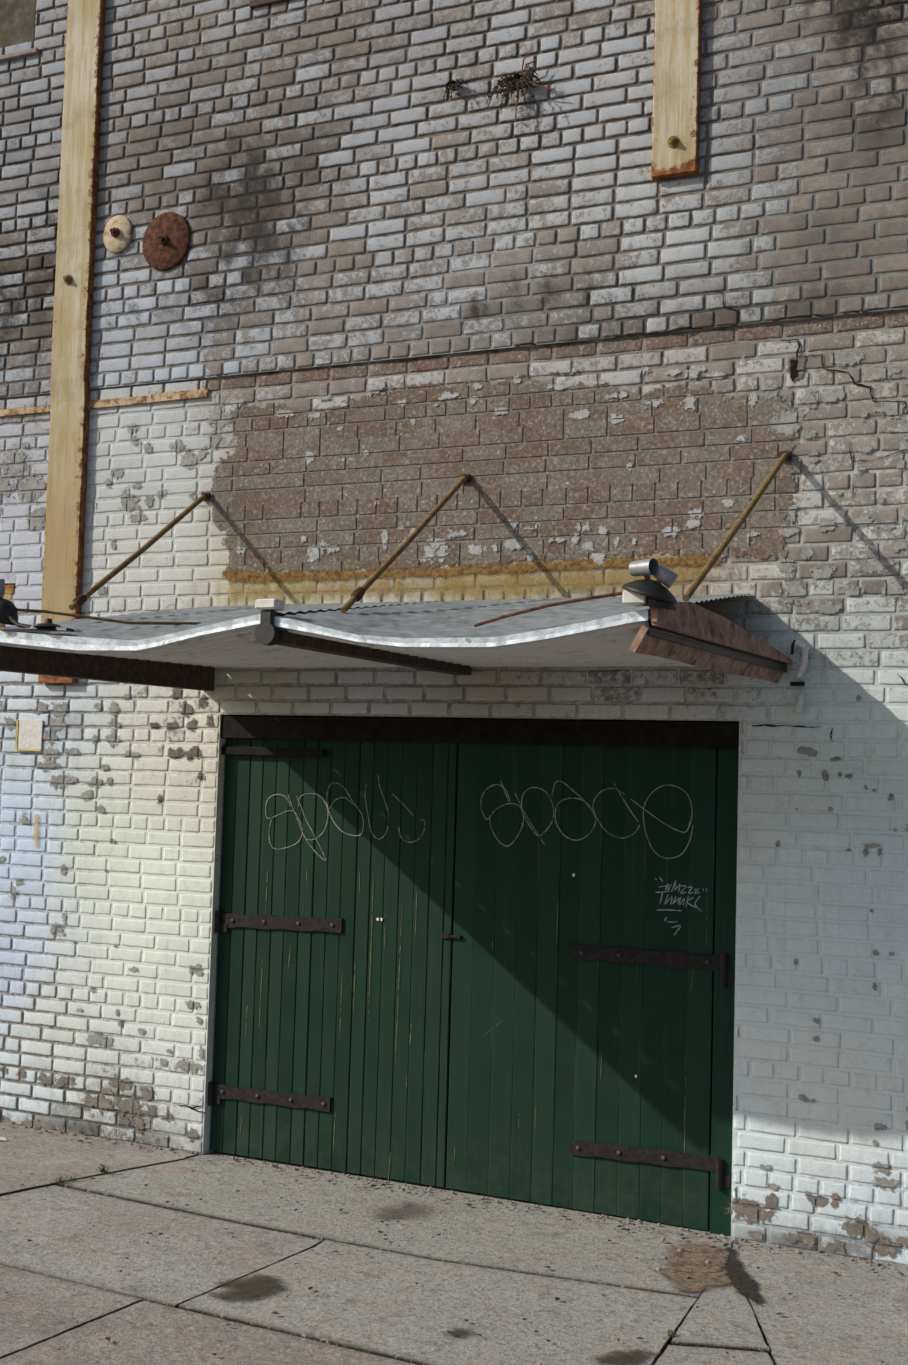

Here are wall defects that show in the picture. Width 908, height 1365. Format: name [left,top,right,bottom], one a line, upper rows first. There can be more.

water stain [197,132,308,290]
crack [217,291,908,413]
peeling [104,468,166,523]
peeling [127,365,908,615]
crack [849,442,902,495]
peeling [0,700,16,731]
peeling [34,693,139,813]
peeling [149,688,214,782]
peeling [872,1123,899,1192]
spalling [721,1164,780,1241]
spalling [782,1191,908,1258]
spalling [647,1237,751,1292]